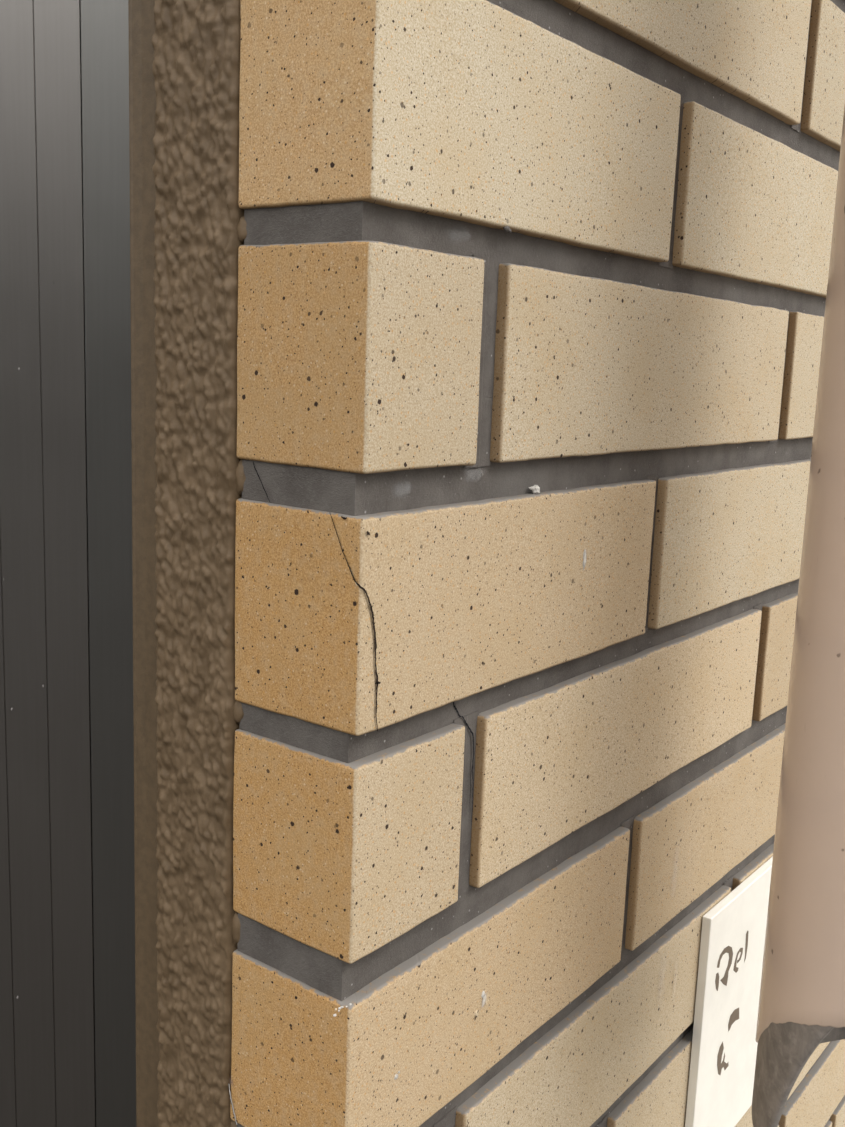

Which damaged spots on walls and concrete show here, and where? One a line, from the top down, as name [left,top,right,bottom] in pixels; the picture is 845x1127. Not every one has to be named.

crack [330,514,381,731]
crack [453,702,474,822]